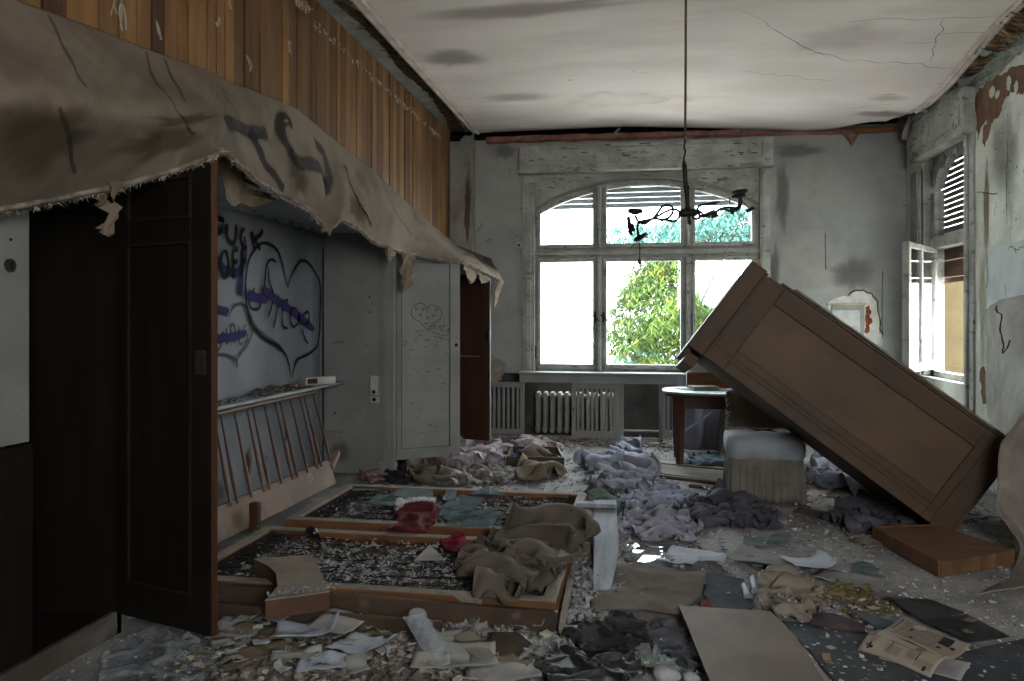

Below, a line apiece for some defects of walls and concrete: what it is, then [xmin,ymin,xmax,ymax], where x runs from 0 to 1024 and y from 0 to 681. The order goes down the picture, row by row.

crack [735,7,995,81]
flaking render [975,65,1024,147]
flaking render [828,289,883,347]
crack [986,246,1024,354]